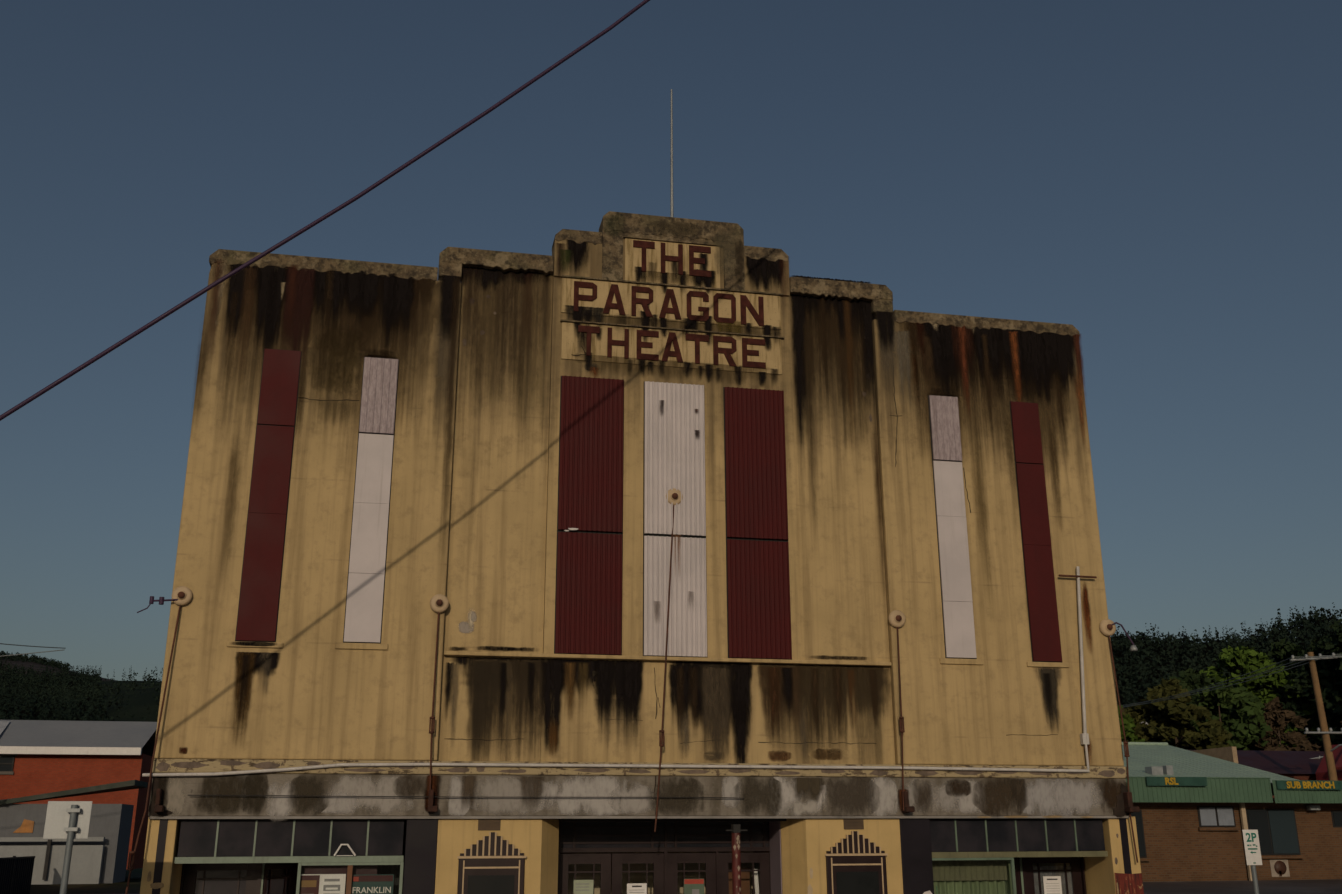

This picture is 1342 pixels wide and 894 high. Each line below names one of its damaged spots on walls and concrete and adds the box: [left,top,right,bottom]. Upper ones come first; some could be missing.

damp [661,238,870,293]
damp [214,240,589,458]
damp [566,305,604,367]
damp [639,360,664,373]
damp [641,304,666,340]
damp [684,295,1084,494]
damp [235,642,279,729]
damp [445,646,642,752]
damp [670,655,1130,818]
damp [152,773,703,816]